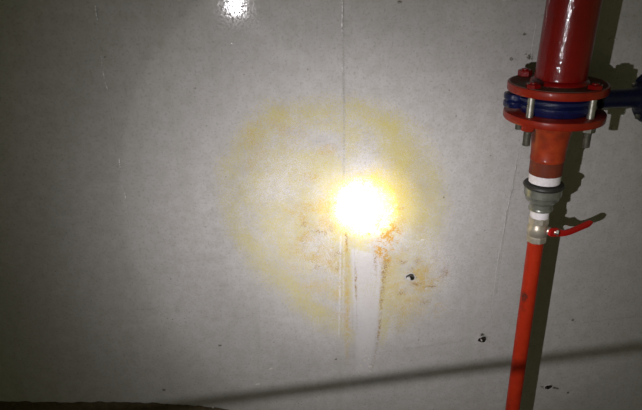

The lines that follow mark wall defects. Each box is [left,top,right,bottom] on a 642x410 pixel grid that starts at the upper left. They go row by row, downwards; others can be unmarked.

damp [212,89,455,374]
crack [338,234,358,339]
corrosion [368,214,404,324]